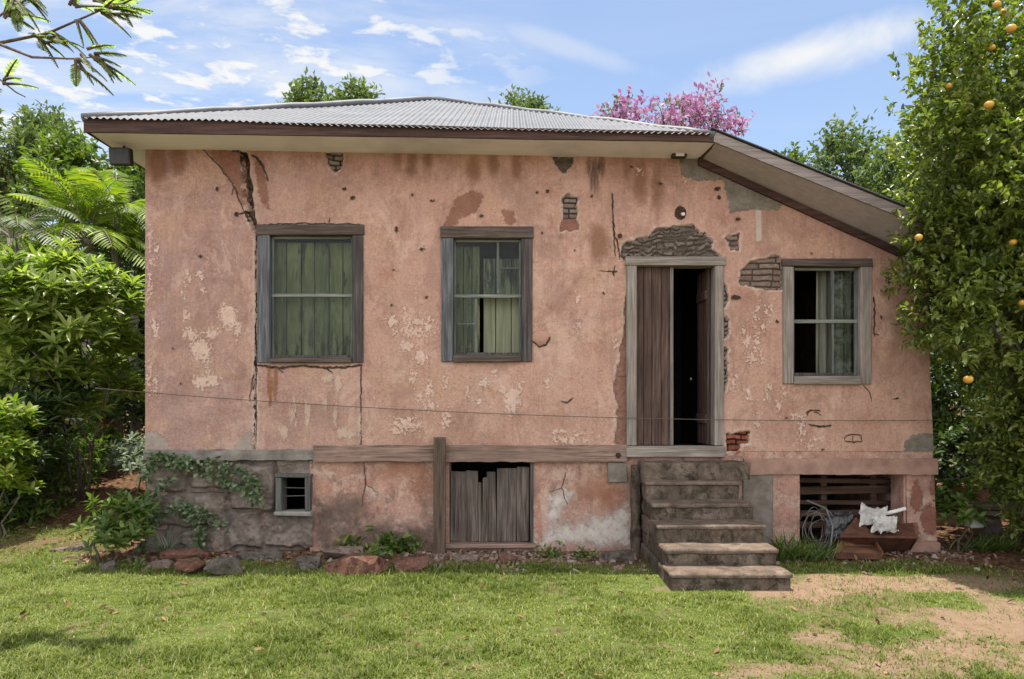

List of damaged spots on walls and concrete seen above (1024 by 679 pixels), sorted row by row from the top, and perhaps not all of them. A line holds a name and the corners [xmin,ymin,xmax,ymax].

spalling [326,152,344,173]
spalling [559,194,579,232]
crack [600,193,620,276]
spalling [618,224,718,260]
peeling [172,254,246,391]
crack [203,150,377,507]
peeling [384,304,526,436]
spalling [724,255,827,455]
water stain [540,489,631,545]